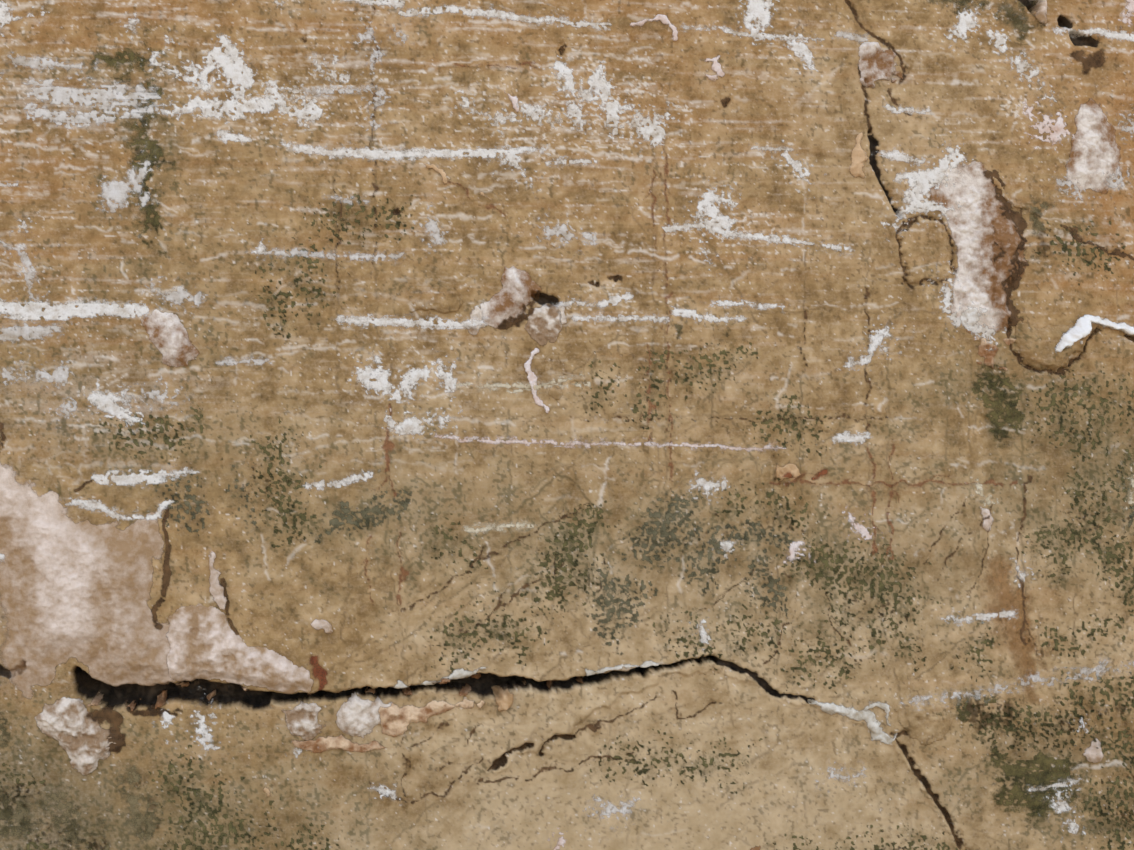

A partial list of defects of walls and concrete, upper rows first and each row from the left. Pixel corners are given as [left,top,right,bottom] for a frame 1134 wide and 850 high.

flaking render [1028,0,1047,26]
peeling [1118,0,1134,27]
crack [845,0,954,289]
crack [1006,327,1134,375]
peeling [2,356,190,425]
flaking render [208,552,227,610]
corrosion [989,561,1036,683]
corrosion [310,656,327,691]
crack [75,623,815,804]
leakage [956,693,997,722]
crack [890,730,963,849]
leakage [985,740,1082,821]